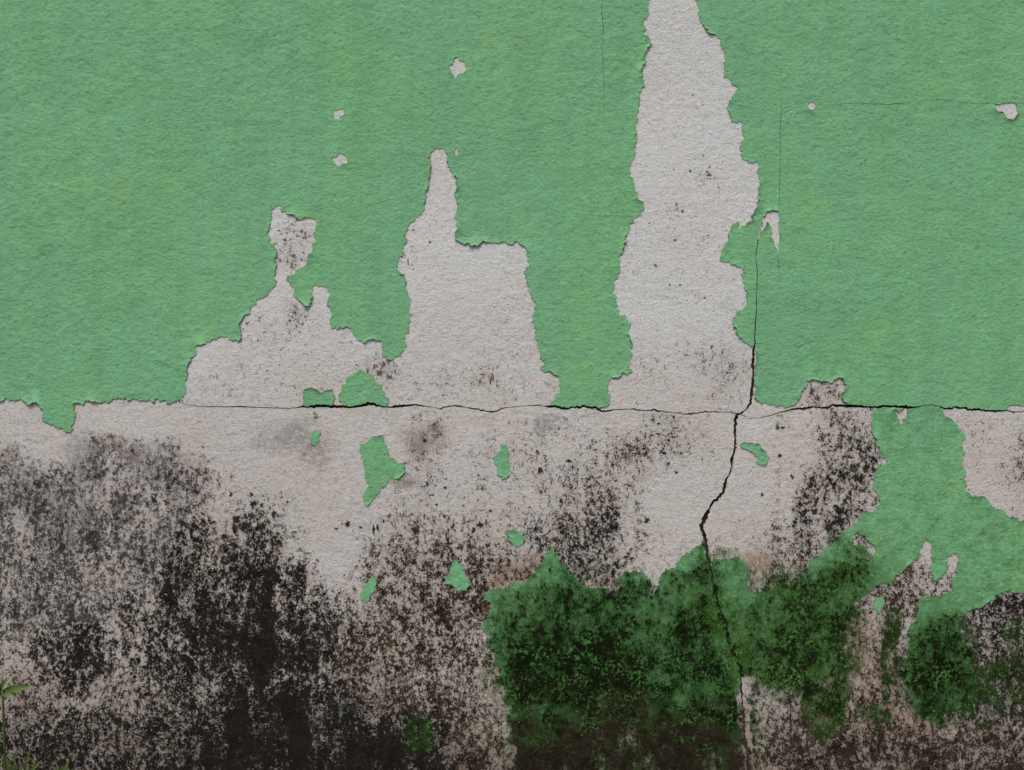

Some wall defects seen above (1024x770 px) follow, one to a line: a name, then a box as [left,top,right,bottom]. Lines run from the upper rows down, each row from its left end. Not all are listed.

peeling [449,57,467,79]
peeling [600,0,847,418]
peeling [988,103,1018,120]
peeling [0,148,888,770]
crack [181,241,1024,595]
peeling [892,406,921,424]
peeling [943,405,1024,521]
leakage [0,411,1024,770]
crack [739,677,749,770]
peeling [735,540,1024,770]